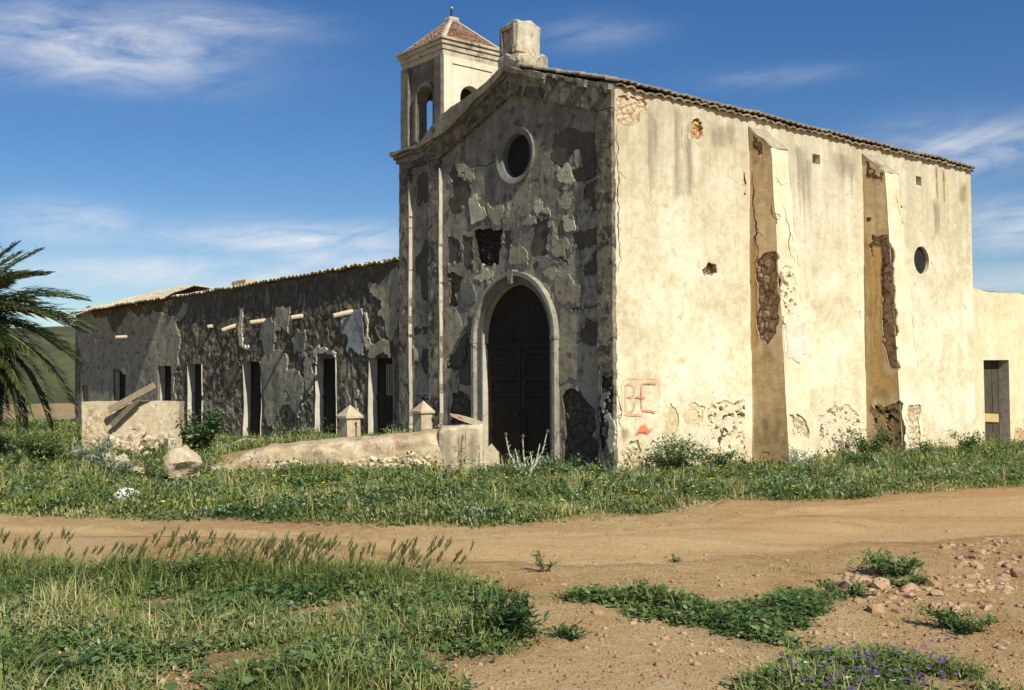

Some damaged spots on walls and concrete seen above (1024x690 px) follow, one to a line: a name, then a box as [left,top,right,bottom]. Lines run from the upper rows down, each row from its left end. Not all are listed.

peeling [416,172,428,212]
crack [552,125,625,272]
spalling [616,91,649,126]
spalling [688,117,705,140]
peeling [76,302,189,452]
peeling [238,266,399,429]
peeling [412,239,429,374]
peeling [443,128,747,471]
spalling [755,250,808,363]
spalling [789,399,922,459]
spalling [867,234,901,368]